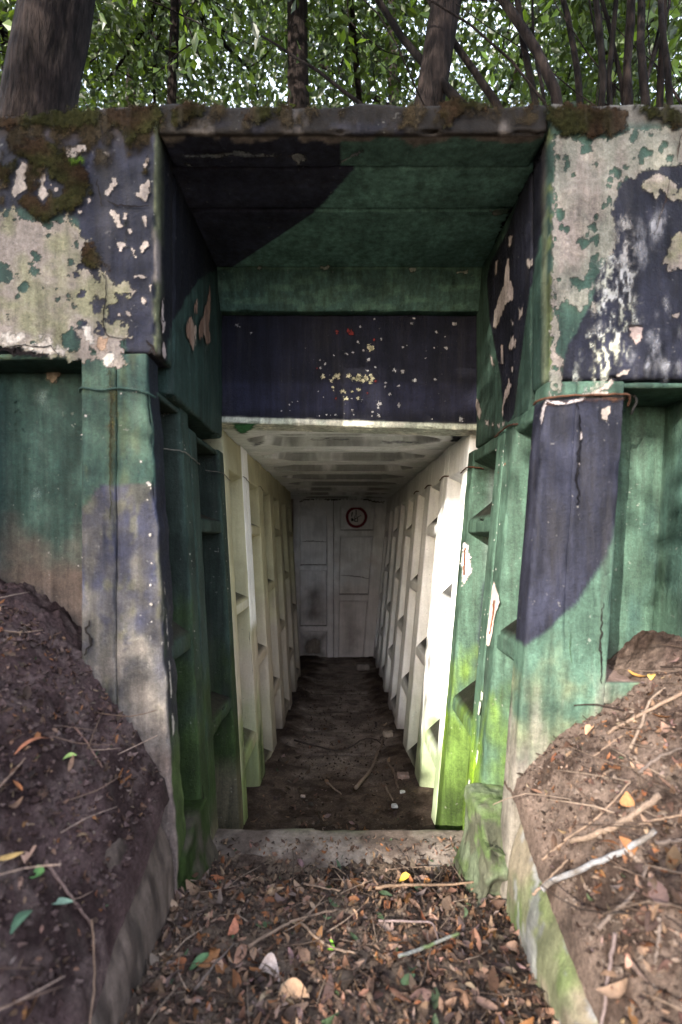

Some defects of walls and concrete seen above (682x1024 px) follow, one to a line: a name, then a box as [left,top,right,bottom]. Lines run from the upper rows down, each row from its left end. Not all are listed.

peeling [66,145,86,158]
peeling [0,158,152,383]
peeling [186,289,211,351]
peeling [316,325,417,417]
peeling [476,235,523,428]
peeling [540,126,682,424]
crack [575,403,583,505]
spalling [460,543,472,583]
spalling [479,583,499,660]